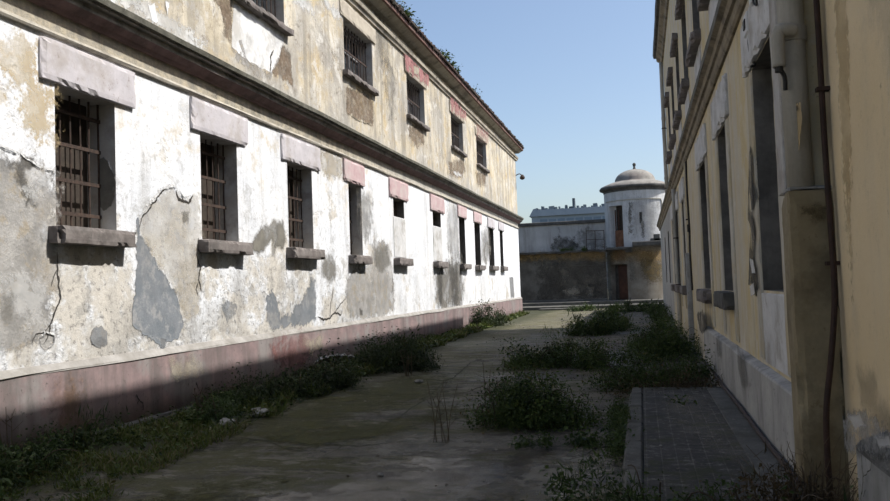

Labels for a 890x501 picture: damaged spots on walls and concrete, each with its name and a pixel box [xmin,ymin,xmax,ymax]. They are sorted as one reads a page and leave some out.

peeling [109,0,208,50]
flaking render [214,0,293,85]
peeling [1,43,55,145]
peeling [139,183,193,227]
flaking render [0,144,64,355]
crack [32,252,61,343]
crack [195,238,203,294]